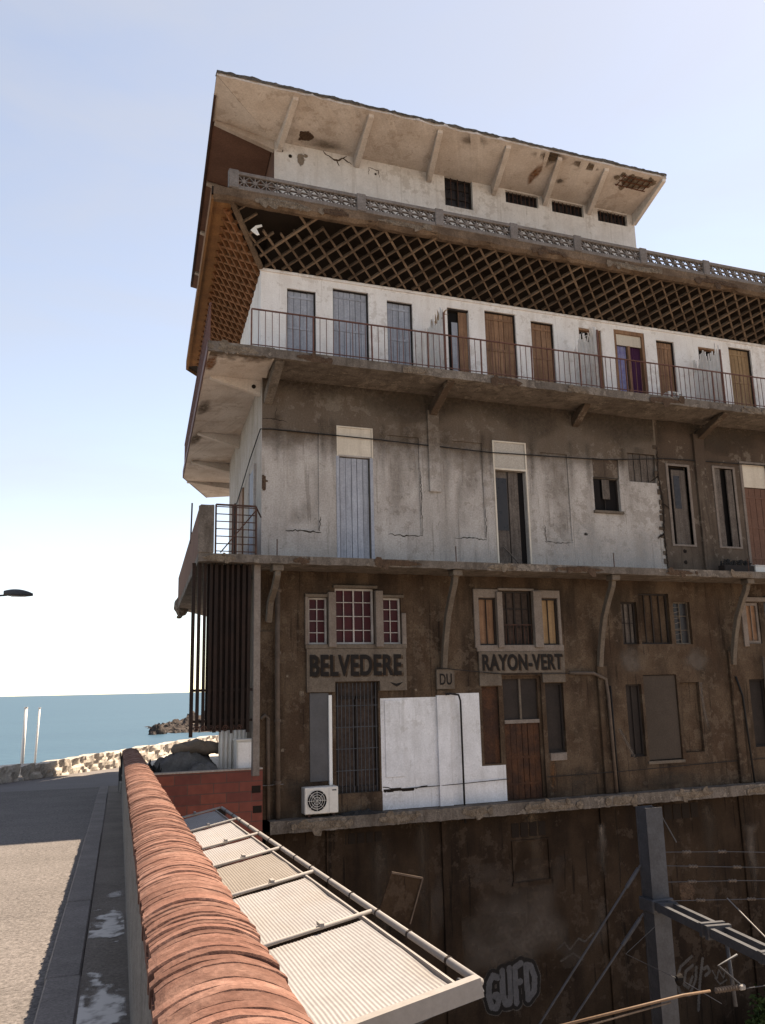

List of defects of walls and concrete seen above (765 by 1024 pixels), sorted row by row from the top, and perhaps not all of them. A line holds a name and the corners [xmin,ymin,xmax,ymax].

spalling [298,131,314,141]
crack [323,151,380,177]
spalling [614,172,657,192]
crack [391,472,423,537]
crack [286,517,321,533]
crack [456,509,487,540]
crack [383,785,427,793]